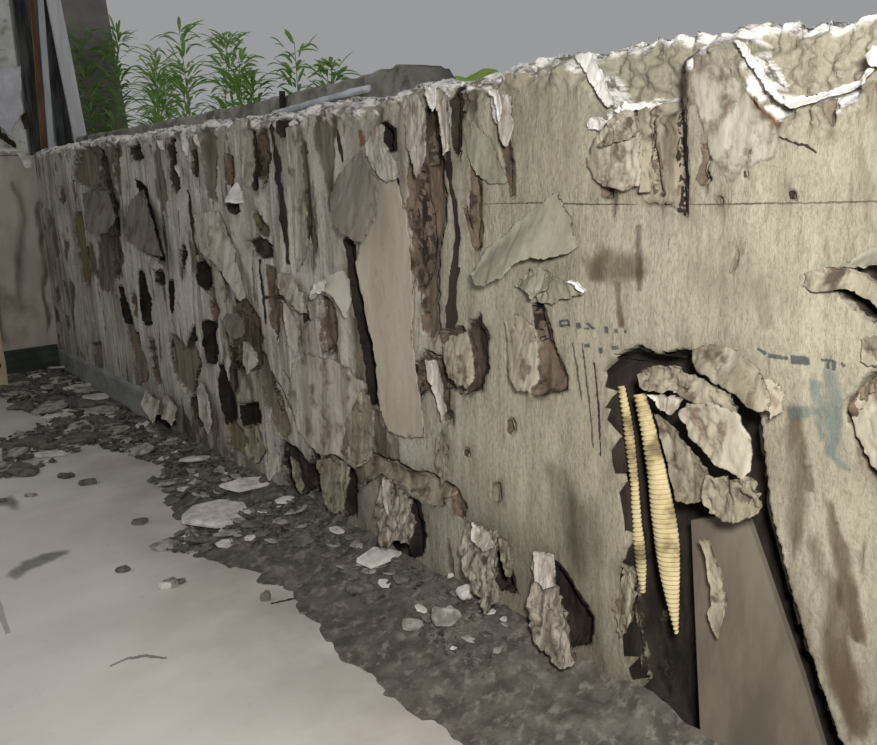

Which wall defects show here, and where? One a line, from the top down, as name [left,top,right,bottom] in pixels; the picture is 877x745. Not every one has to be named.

crack [0,127,16,148]
peeling [0,66,29,136]
peeling [0,147,31,168]
peeling [575,51,777,216]
peeling [733,39,877,125]
peeling [74,143,178,426]
peeling [157,86,587,615]
spalling [605,344,844,745]
peeling [525,551,595,669]